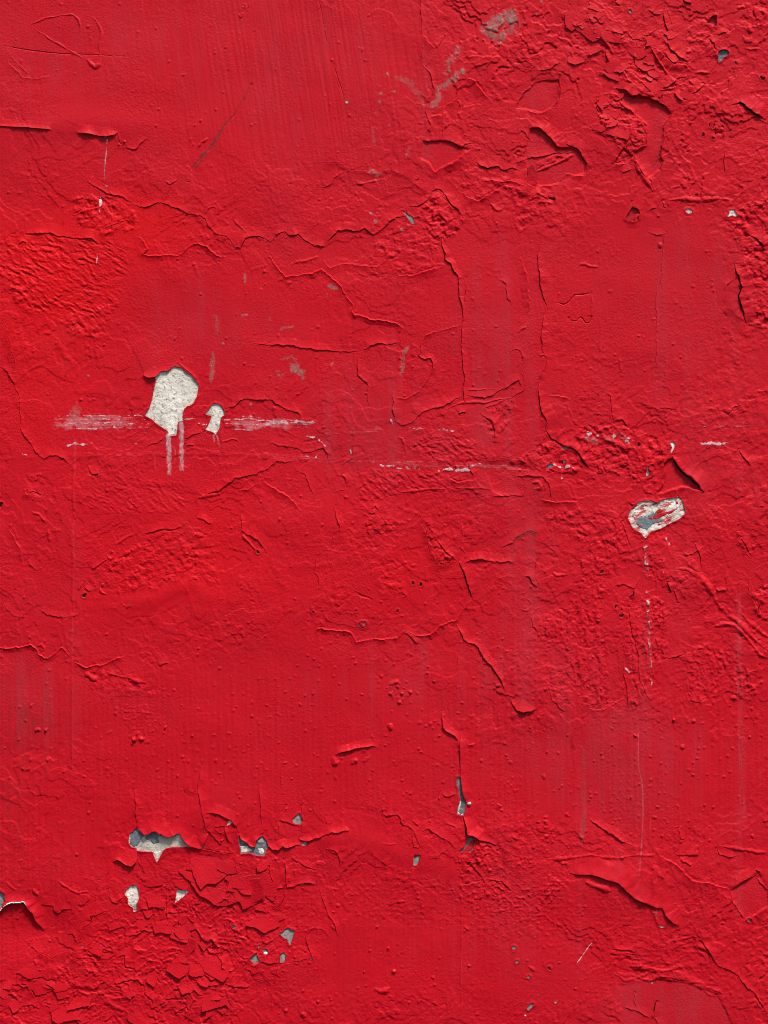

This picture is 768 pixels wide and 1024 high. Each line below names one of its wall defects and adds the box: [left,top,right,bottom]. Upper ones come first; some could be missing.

spalling [508,2,732,205]
crack [647,148,733,265]
water stain [58,412,145,430]
peeling [142,359,228,438]
water stain [226,416,325,446]
crack [115,161,678,633]
spalling [513,424,768,727]
crack [598,541,708,712]
crack [736,530,768,621]
spalling [0,782,354,1024]
spalling [380,709,722,998]
crack [689,921,768,1022]